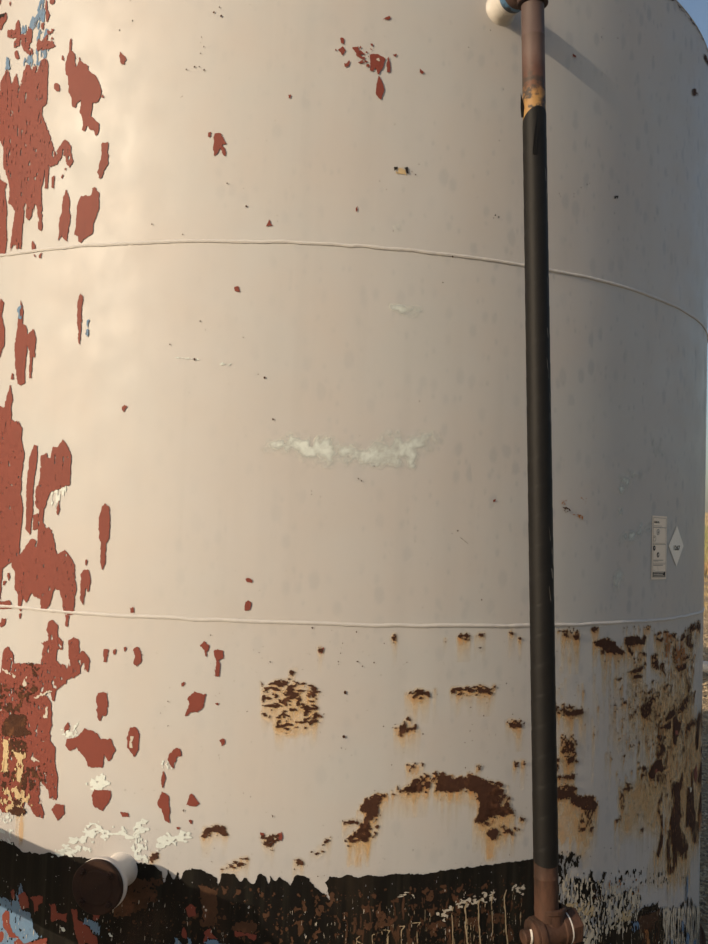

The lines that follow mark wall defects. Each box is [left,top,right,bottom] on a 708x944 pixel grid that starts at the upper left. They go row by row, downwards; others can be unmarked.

peeling [335,37,397,99]
peeling [0,0,108,258]
leakage [270,436,428,468]
peeling [0,294,115,845]
peeling [103,647,142,666]
peeling [126,727,140,757]
corrosion [261,669,324,734]
corrosion [383,717,424,748]
corrosion [451,676,507,708]
corrosion [556,620,703,886]
corrosion [342,763,533,858]
peeling [0,879,525,944]